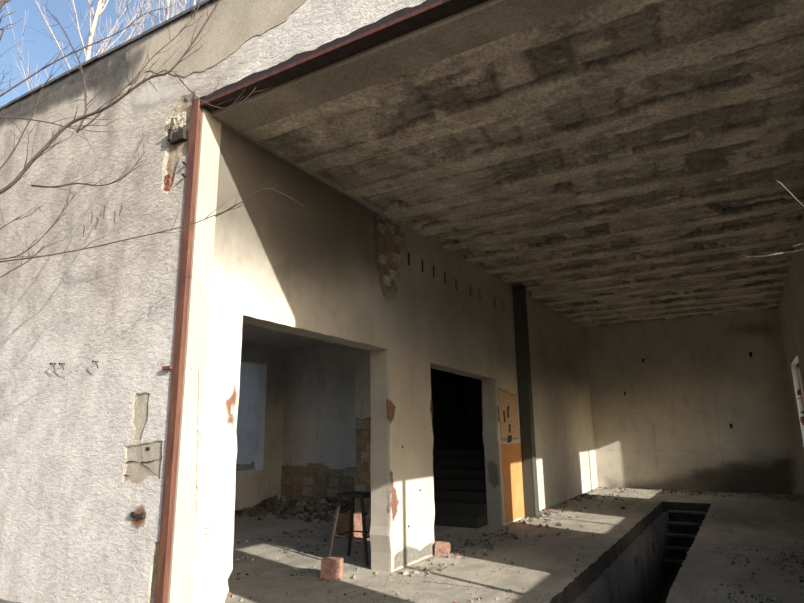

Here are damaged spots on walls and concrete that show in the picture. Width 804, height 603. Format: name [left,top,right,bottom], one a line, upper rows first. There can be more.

flaking render [125,0,307,85]
flaking render [162,92,195,194]
flaking render [122,392,163,486]
flaking render [227,388,237,423]
flaking render [387,400,395,422]
peeling [498,389,519,443]
corrosion [133,506,145,527]